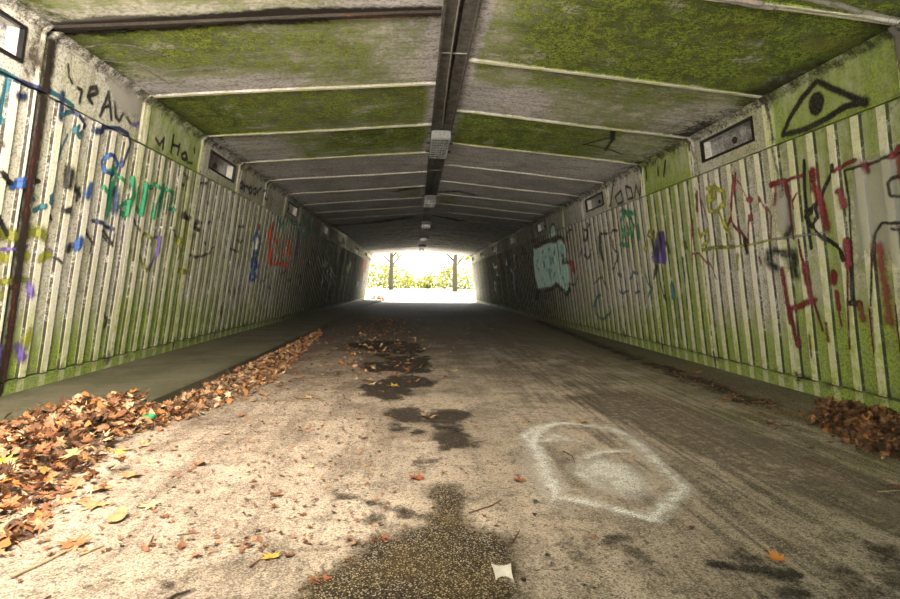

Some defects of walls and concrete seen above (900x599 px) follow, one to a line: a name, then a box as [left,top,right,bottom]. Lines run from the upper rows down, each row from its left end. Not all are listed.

water stain [25,6,442,79]
water stain [759,98,783,197]
corrosion [0,37,56,397]
water stain [294,483,527,599]